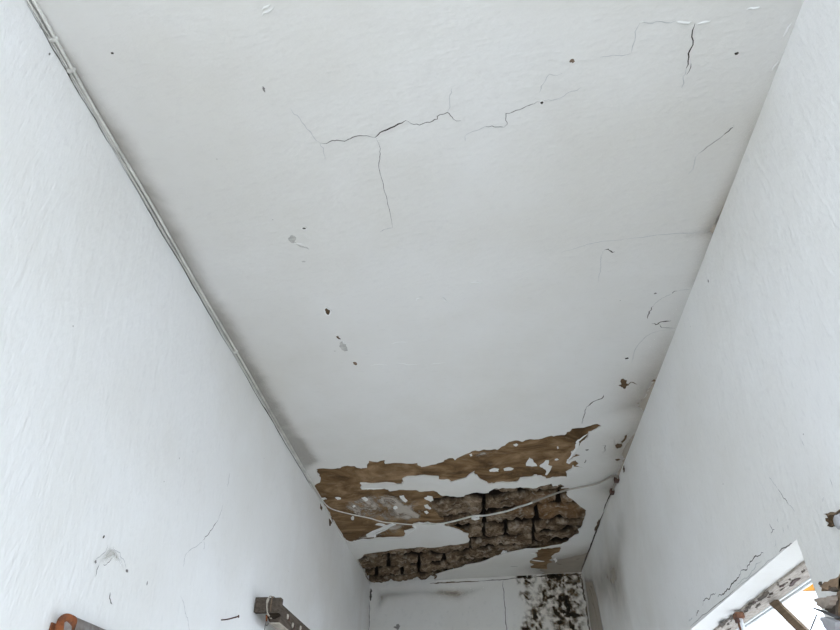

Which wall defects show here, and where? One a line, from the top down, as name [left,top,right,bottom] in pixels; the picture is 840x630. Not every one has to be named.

crack [603,20,712,86]
crack [291,73,580,231]
flaking render [315,424,601,583]
flaking render [825,510,840,527]
water stain [517,553,604,630]
crack [689,543,792,626]